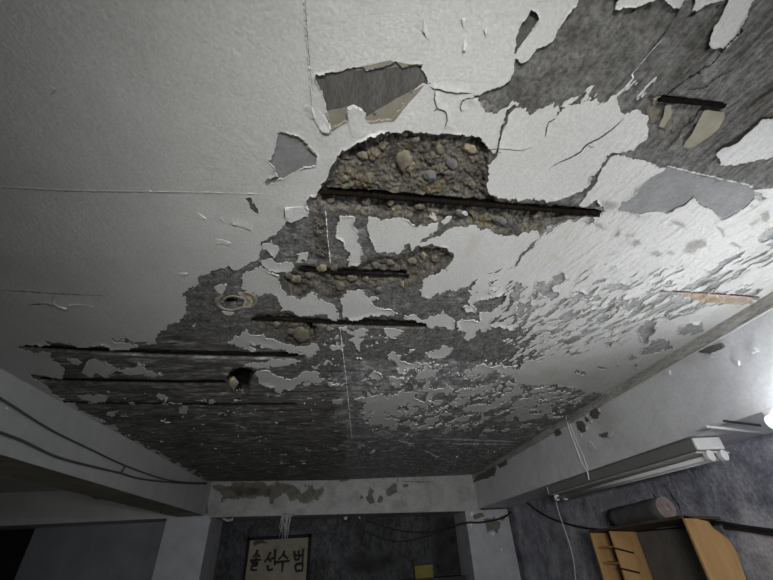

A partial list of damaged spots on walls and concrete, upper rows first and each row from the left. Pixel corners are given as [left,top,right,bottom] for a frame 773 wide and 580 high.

peeling [312,60,430,138]
crack [431,87,476,129]
crack [485,110,529,157]
crack [550,118,624,168]
peeling [367,0,773,421]
peeling [17,130,602,483]
peeling [360,483,397,504]